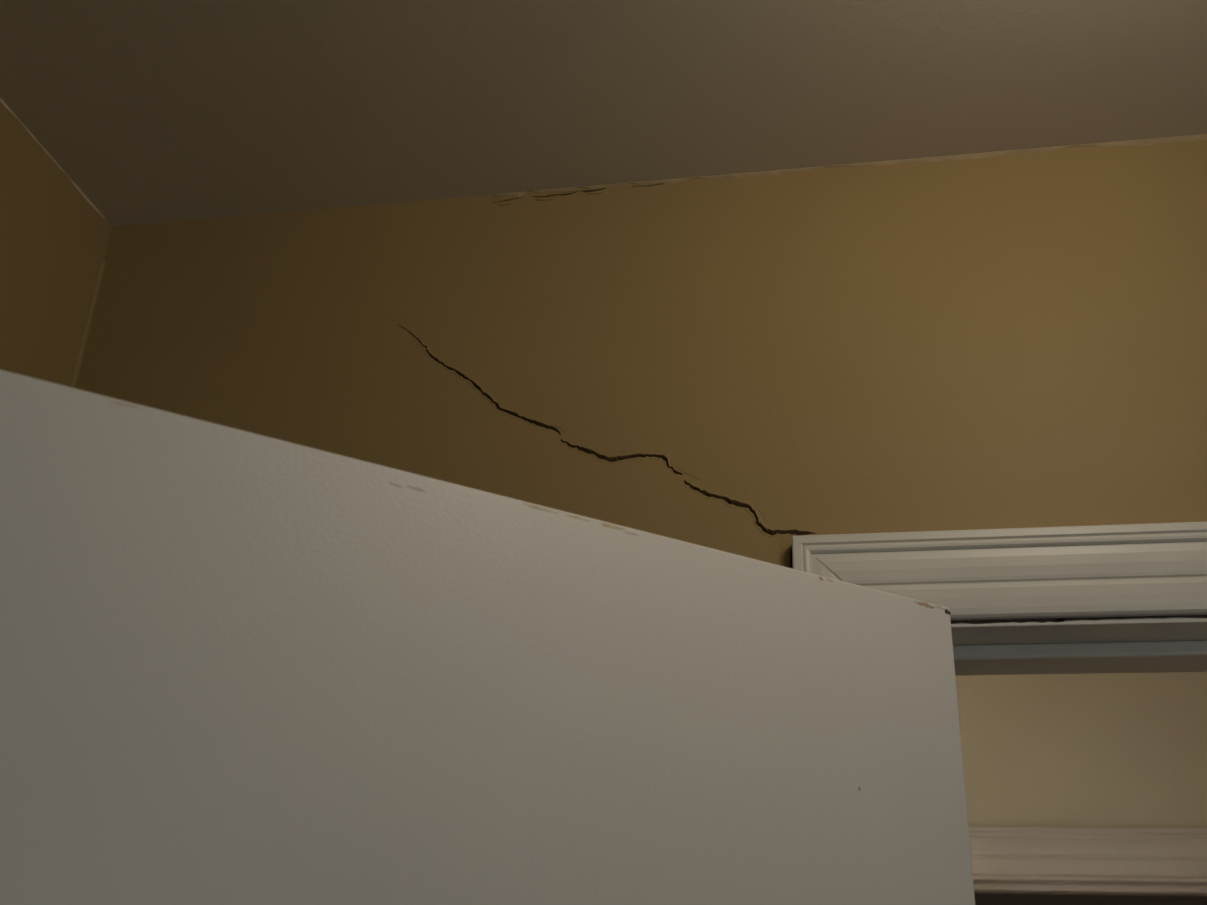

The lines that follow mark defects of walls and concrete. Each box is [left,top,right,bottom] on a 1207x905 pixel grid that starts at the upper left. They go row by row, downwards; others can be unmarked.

crack [387,319,843,581]